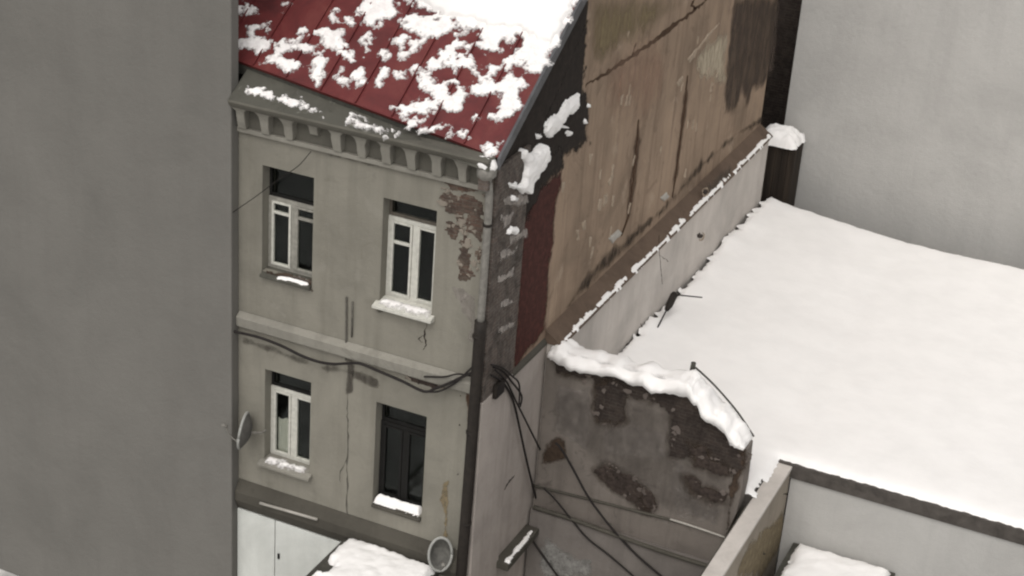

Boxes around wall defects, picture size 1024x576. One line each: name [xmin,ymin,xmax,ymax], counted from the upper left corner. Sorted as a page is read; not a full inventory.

crack [585,0,707,88]
water stain [725,0,778,110]
flaking render [436,174,485,282]
crack [339,394,349,514]
flaking render [555,363,752,513]